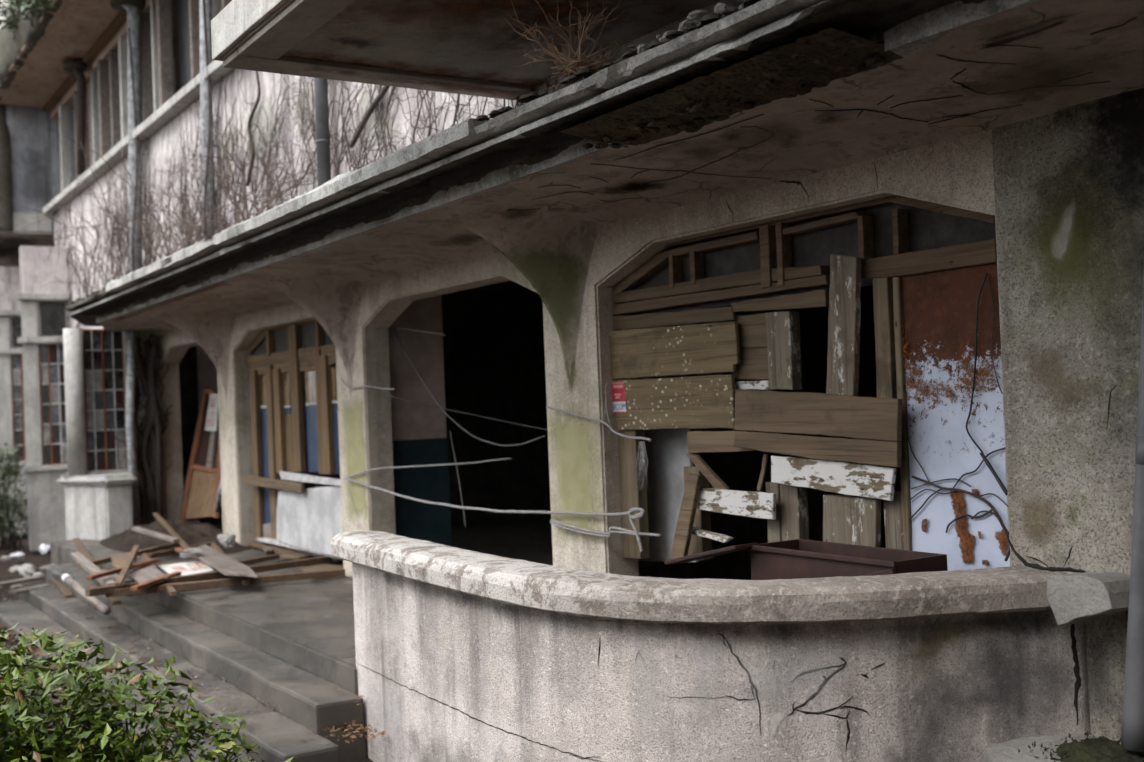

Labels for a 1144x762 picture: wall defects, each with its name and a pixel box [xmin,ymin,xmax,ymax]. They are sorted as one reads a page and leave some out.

spalling [560,27,904,149]
crack [809,44,1042,125]
leakage [84,5,910,320]
leakage [1040,88,1144,255]
leakage [502,252,583,344]
corrosion [891,322,1002,416]
corrosion [950,489,1009,565]
crack [357,663,602,762]
crack [669,633,886,749]
crack [1070,624,1081,725]